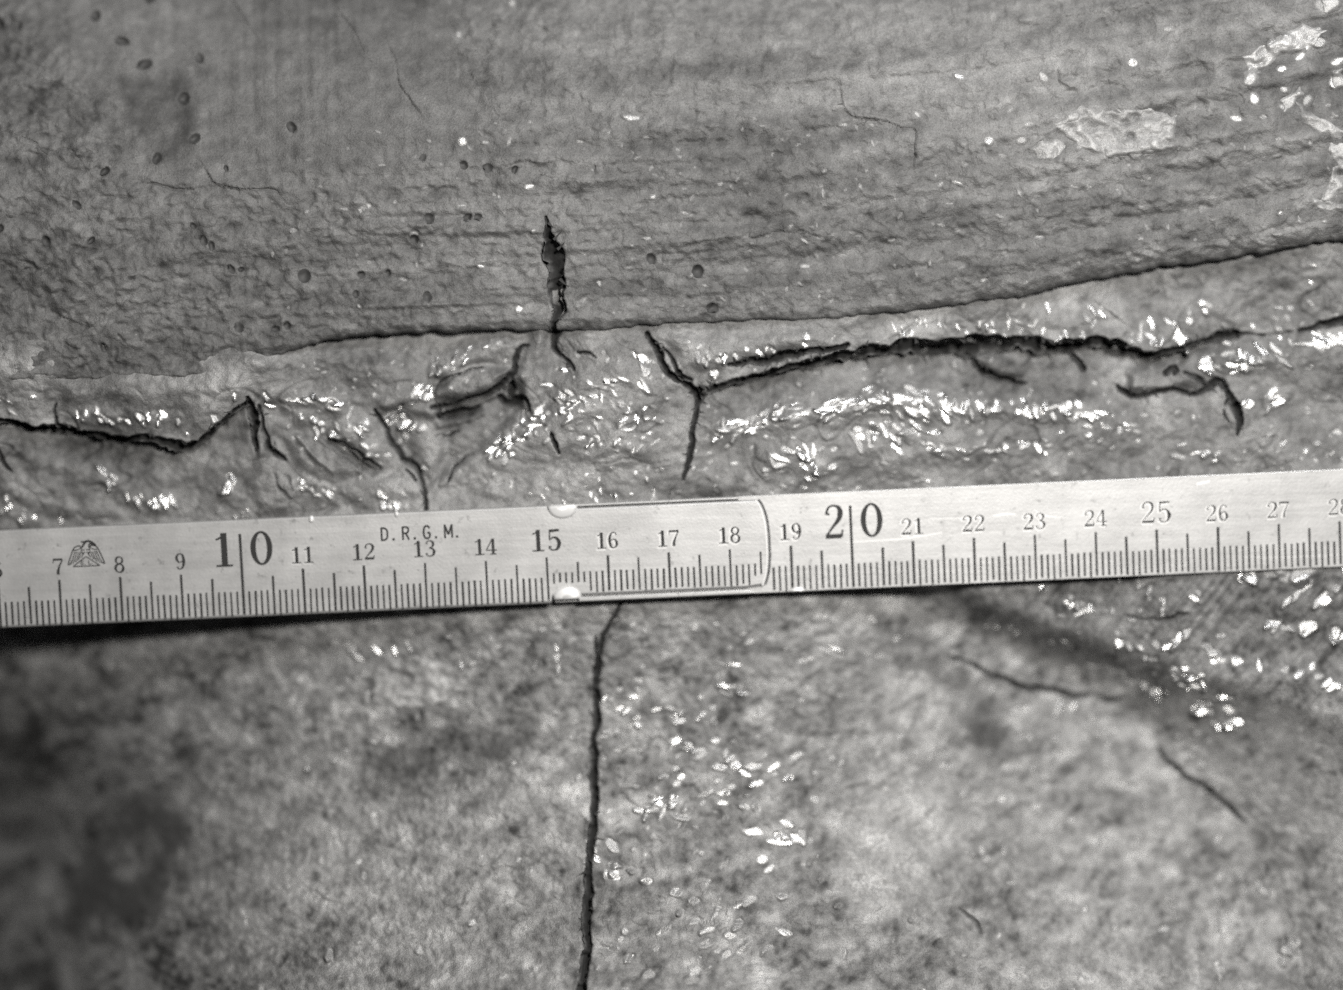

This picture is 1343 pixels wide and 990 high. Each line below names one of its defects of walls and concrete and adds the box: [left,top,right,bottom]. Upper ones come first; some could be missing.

crack [0,397,294,501]
crack [332,217,596,510]
crack [646,315,1343,499]
crack [946,655,1124,703]
crack [576,602,628,990]
crack [1157,746,1247,823]